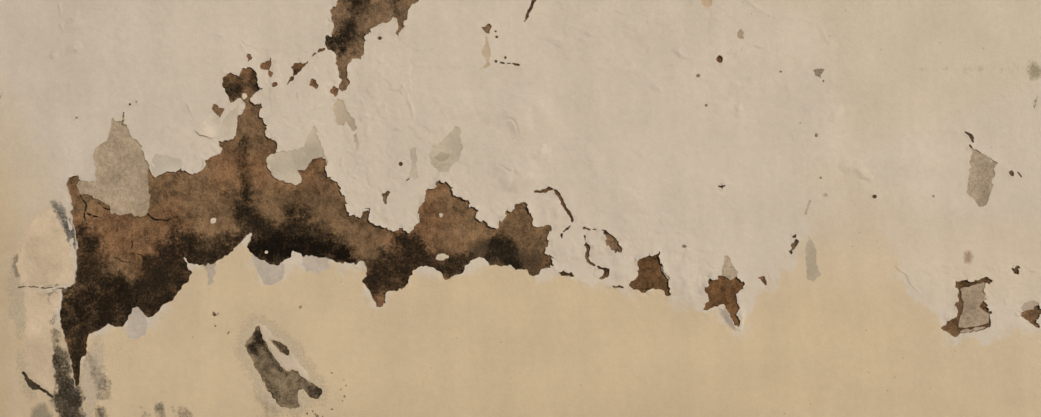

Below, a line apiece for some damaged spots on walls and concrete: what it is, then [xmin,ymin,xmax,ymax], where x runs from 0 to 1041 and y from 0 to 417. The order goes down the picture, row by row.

damp [223,71,260,100]
damp [325,0,370,54]
flaking render [309,0,419,151]
peeling [480,24,498,69]
peeling [967,148,997,207]
flaking render [16,54,574,391]
damp [33,136,570,417]
flaking render [583,226,678,296]
flaking render [703,256,767,332]
flaking render [941,274,994,337]
flaking render [1016,301,1041,328]